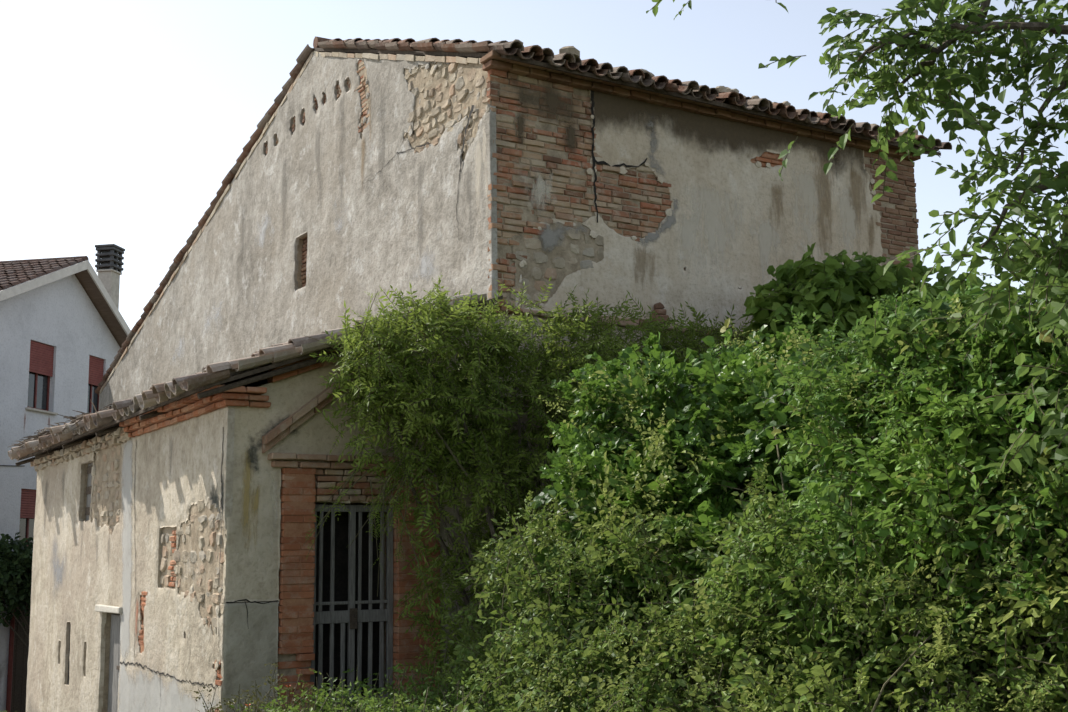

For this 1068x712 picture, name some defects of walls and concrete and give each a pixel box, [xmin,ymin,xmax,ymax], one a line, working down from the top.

crack [456,105,474,240]
flaking render [402,56,673,317]
crack [591,90,647,223]
leakage [592,91,866,247]
flaking render [751,152,783,168]
flaking render [89,444,122,534]
crack [120,483,218,711]
flaking render [168,498,226,635]
crack [213,441,278,657]